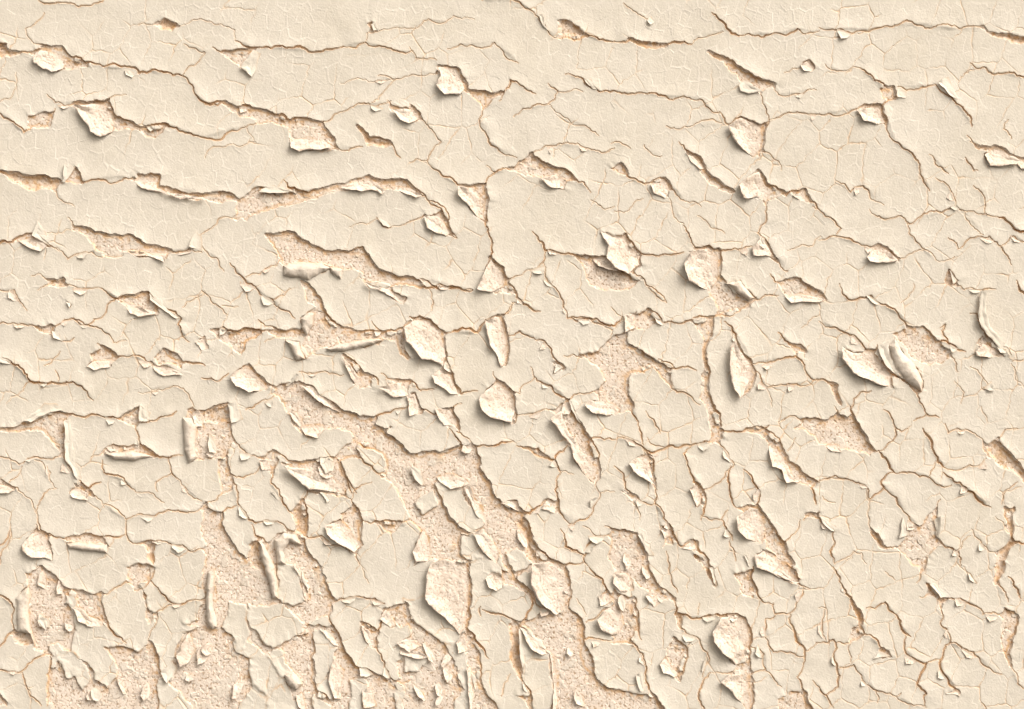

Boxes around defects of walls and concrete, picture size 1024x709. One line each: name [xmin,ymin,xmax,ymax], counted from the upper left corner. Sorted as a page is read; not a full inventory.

peeling [72,99,137,136]
crack [0,0,270,159]
peeling [203,99,402,159]
crack [408,72,719,188]
peeling [133,172,458,240]
crack [0,272,195,427]
crack [0,424,297,554]
peeling [0,183,679,709]
crack [455,430,613,567]
peeling [556,18,1005,607]
crack [672,62,1024,709]
peeling [660,636,692,683]